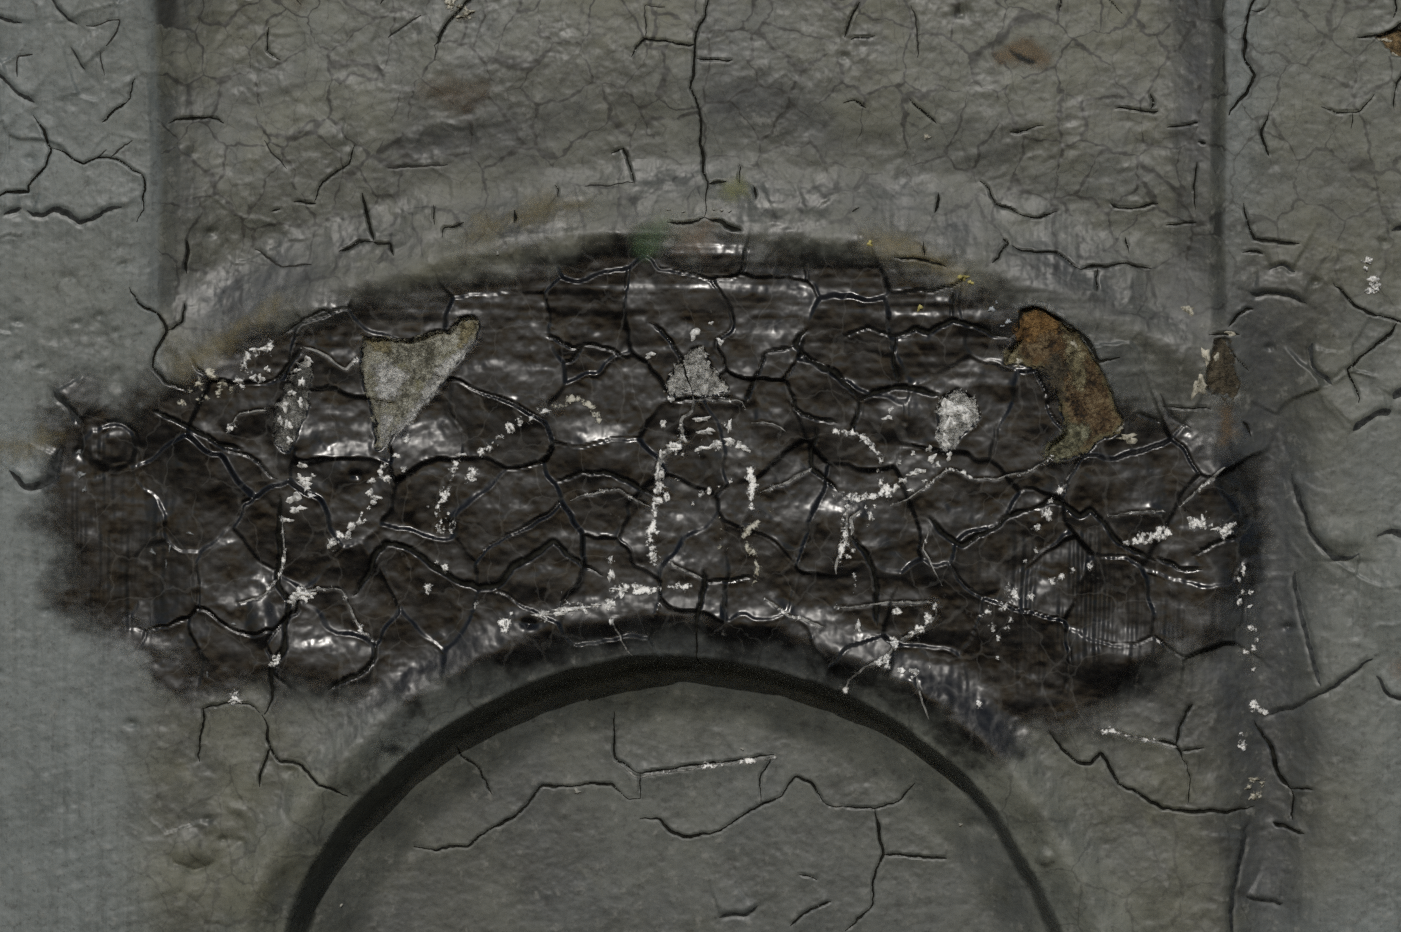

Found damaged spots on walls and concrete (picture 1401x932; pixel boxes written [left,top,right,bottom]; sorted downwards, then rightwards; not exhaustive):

crack [0,19,146,222]
crack [631,0,741,231]
crack [129,240,603,796]
peeling [327,317,479,549]
damp [39,234,1265,759]
peeling [666,321,730,403]
peeling [645,416,773,586]
crack [546,193,1244,697]
peeling [832,388,981,594]
corrosion [1003,307,1138,462]
crack [414,711,945,931]
crack [1050,704,1312,834]